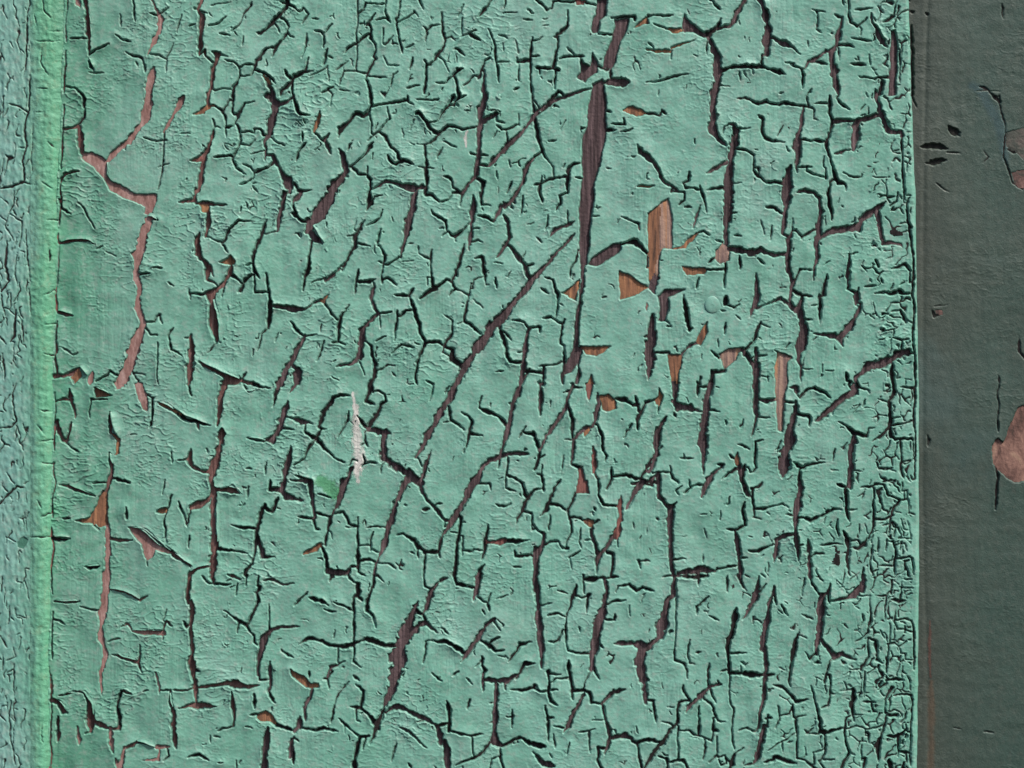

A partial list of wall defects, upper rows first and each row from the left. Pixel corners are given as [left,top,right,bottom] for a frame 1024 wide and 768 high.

peeling [47,287,73,374]
crack [0,0,143,768]
peeling [17,491,194,693]
peeling [57,0,185,414]
crack [134,0,916,768]
peeling [535,0,729,384]
peeling [760,352,793,431]
peeling [992,376,1024,507]